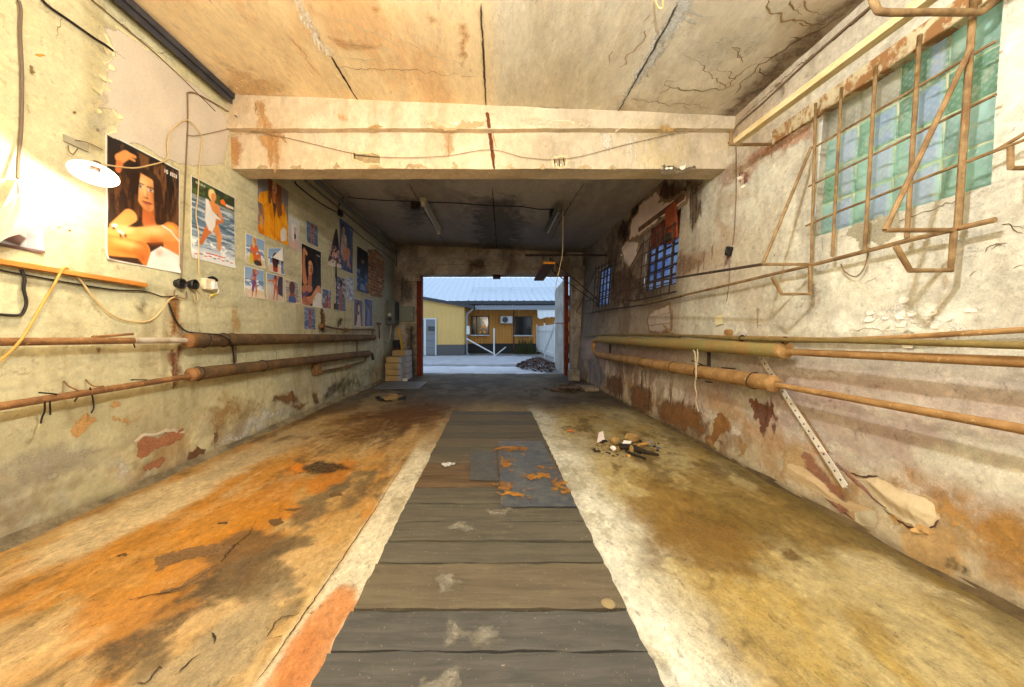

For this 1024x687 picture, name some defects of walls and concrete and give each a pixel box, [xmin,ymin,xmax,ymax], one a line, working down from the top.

peeling [92,25,230,166]
crack [292,5,486,104]
crack [609,0,871,138]
rust [486,112,496,169]
spalling [620,189,689,268]
peeling [71,414,97,438]
spalling [134,428,185,471]
spalling [187,432,218,460]